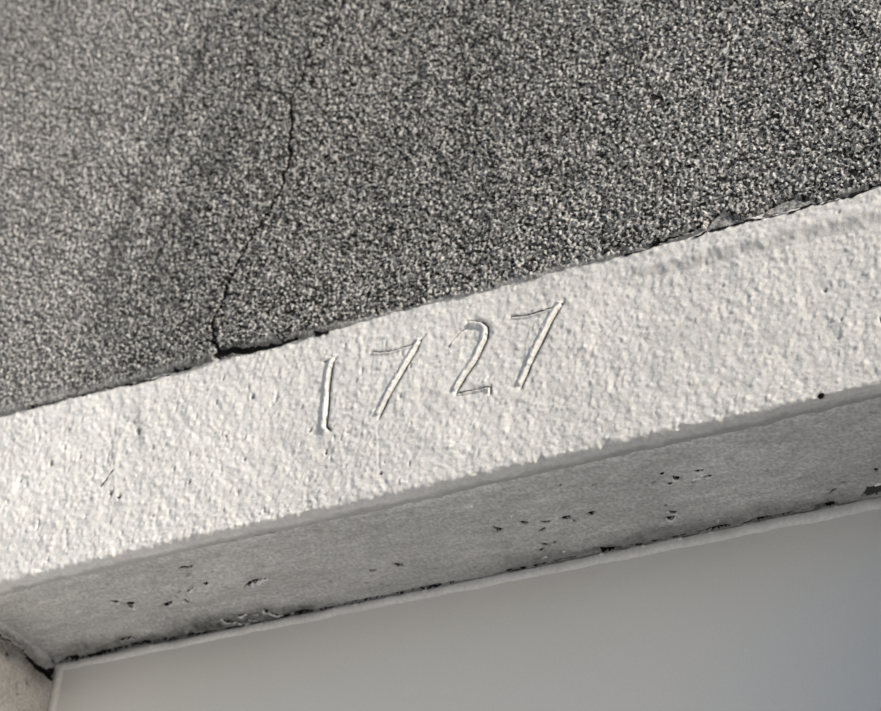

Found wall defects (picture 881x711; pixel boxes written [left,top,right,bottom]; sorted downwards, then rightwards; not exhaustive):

crack [201,0,345,353]